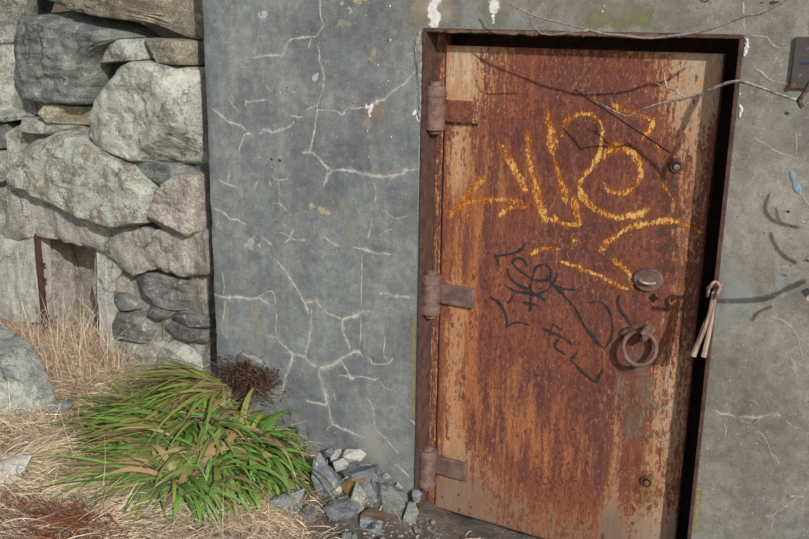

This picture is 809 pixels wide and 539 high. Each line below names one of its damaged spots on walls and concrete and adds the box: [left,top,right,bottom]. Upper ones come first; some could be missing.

damp [409,0,456,28]
damp [486,0,509,24]
crack [213,0,417,477]